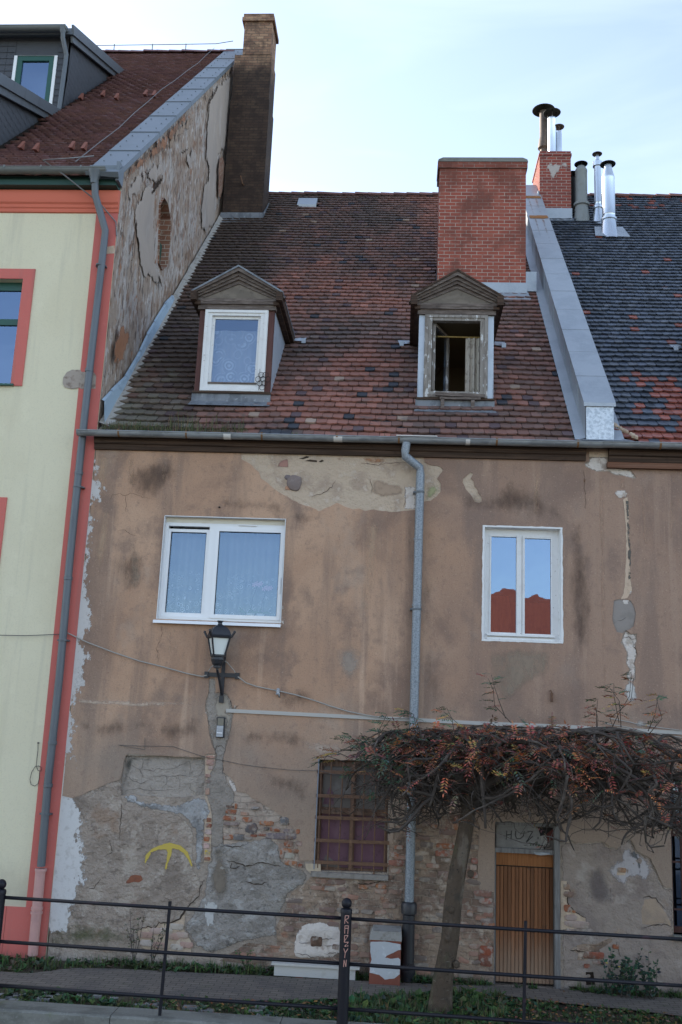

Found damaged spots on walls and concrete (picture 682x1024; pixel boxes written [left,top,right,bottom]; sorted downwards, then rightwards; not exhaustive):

flaking render [127,113,190,284]
flaking render [187,75,233,231]
flaking render [463,473,482,503]
flaking render [585,451,634,477]
flaking render [49,453,460,980]
flaking render [622,632,637,701]
crack [222,845,281,885]
flaking render [454,818,495,981]
flaking render [560,840,682,994]